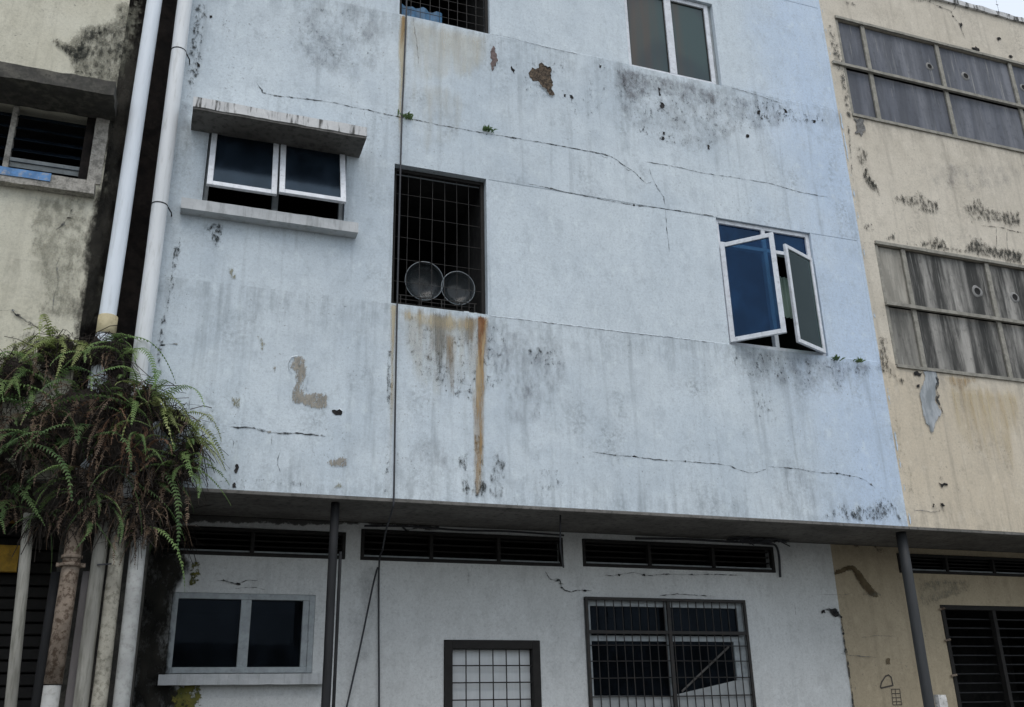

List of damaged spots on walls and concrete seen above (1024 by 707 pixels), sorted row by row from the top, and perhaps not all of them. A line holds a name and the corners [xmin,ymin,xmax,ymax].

spalling [490,46,499,71]
spalling [529,62,573,99]
damp [35,3,141,337]
crack [258,85,815,242]
damp [966,199,1020,227]
damp [920,238,1022,263]
peeling [274,355,342,415]
corrosion [465,316,487,482]
peeling [914,371,943,440]
crack [232,426,323,470]
crack [546,573,732,596]
damp [834,565,878,597]